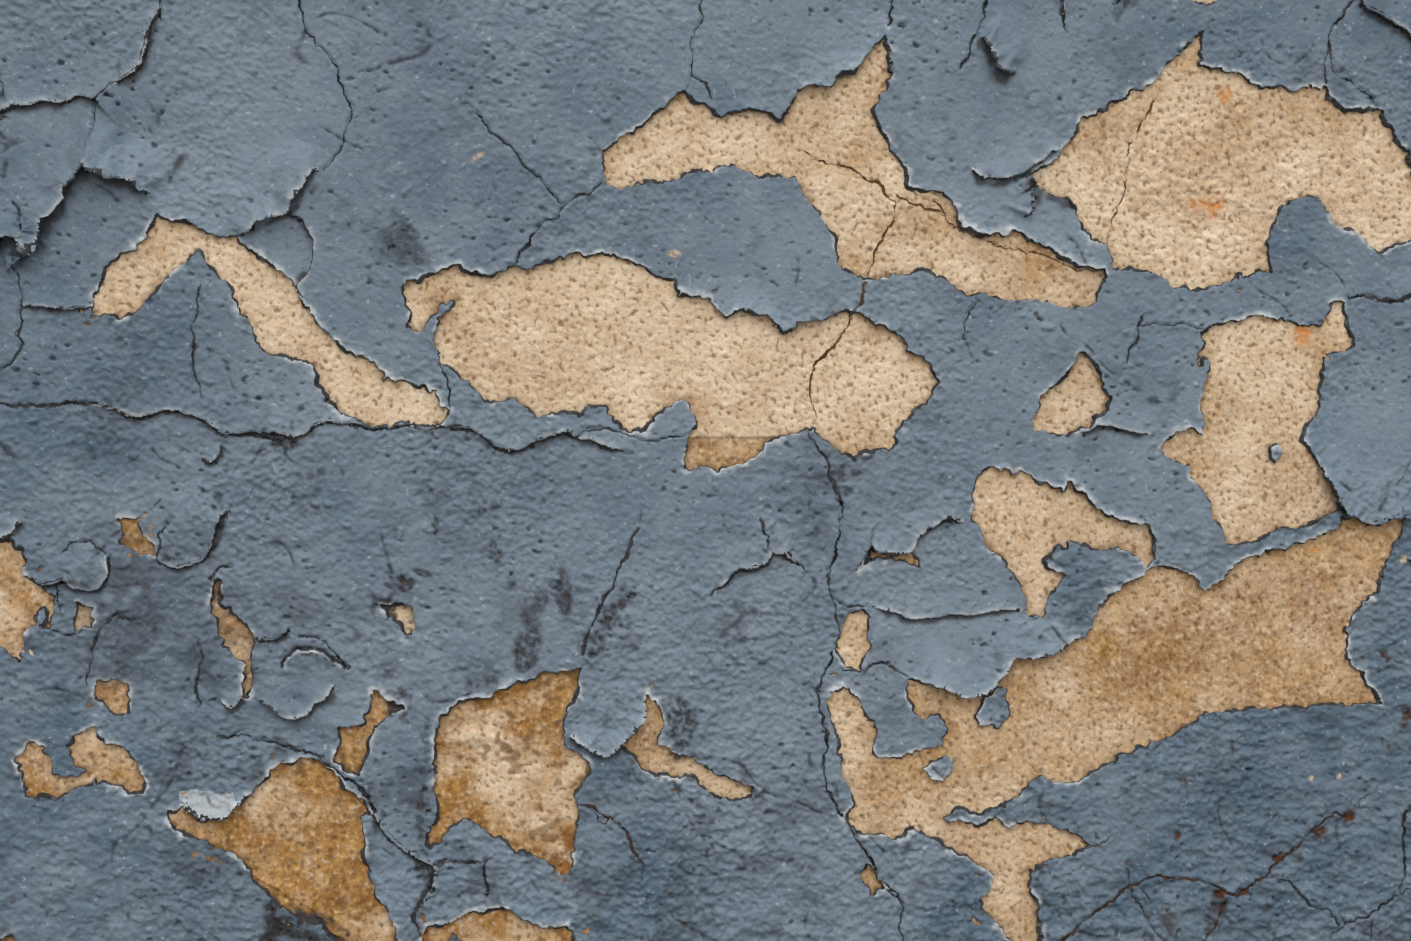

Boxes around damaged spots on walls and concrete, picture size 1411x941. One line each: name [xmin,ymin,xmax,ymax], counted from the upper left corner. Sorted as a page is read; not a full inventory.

peeling [79,137,449,427]
crack [0,256,686,456]
crack [471,109,602,265]
peeling [403,252,938,473]
peeling [603,4,1411,317]
peeling [0,542,54,659]
crack [582,513,642,656]
crack [710,87,1160,941]
peeling [817,301,1411,941]
crack [216,733,490,940]
peeling [169,668,751,941]
crack [1058,794,1411,941]